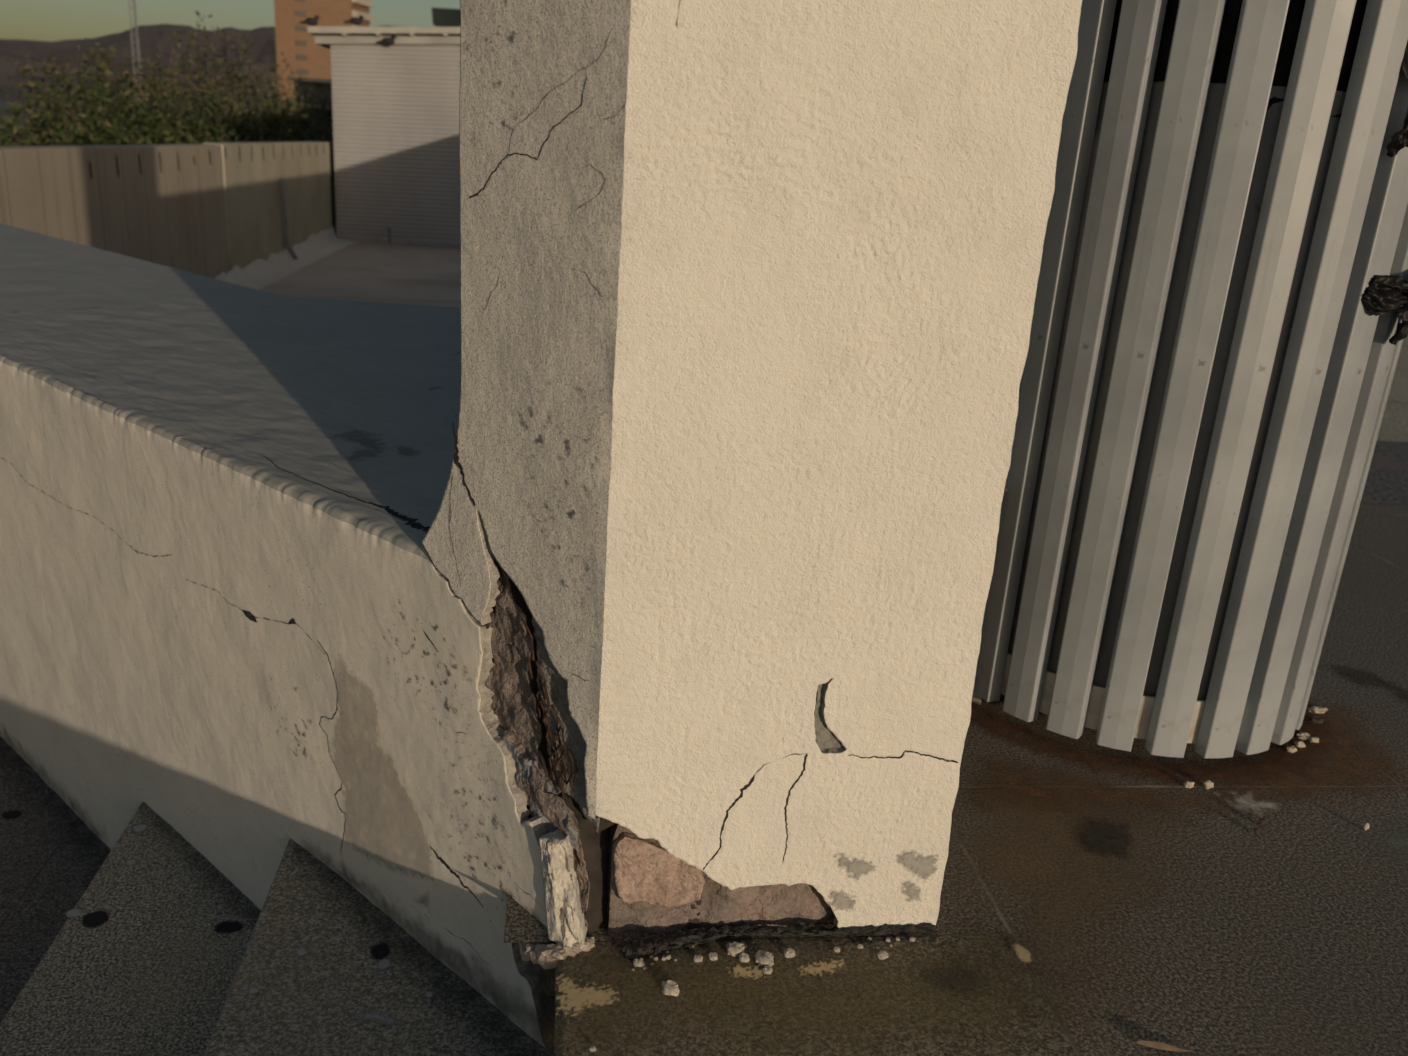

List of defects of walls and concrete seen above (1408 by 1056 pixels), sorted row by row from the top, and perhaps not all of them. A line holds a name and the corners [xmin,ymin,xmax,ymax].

crack [469,28,625,199]
crack [263,414,475,585]
crack [1,458,346,848]
spalling [485,558,875,942]
crack [703,753,808,871]
crack [849,750,958,763]
rust [970,702,1328,787]